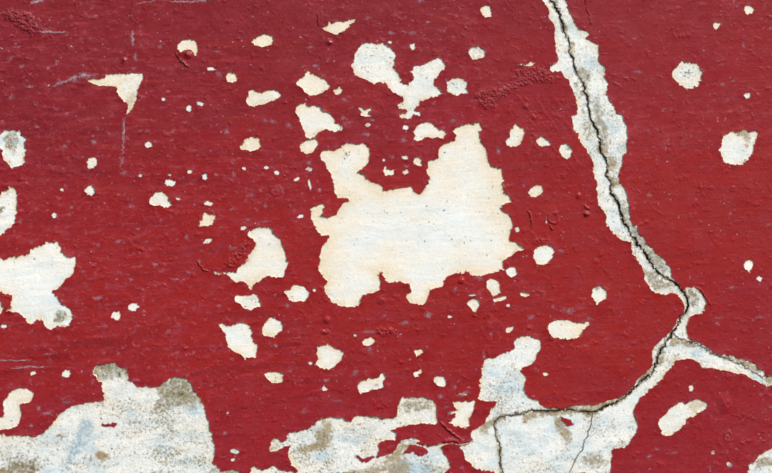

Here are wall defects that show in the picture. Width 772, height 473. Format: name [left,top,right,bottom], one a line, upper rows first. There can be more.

peeling [88,72,143,114]
peeling [0,129,27,169]
peeling [0,185,18,235]
peeling [0,241,77,329]
peeling [214,226,289,310]
peeling [246,0,772,473]
crack [493,0,772,473]
peeling [0,362,240,473]